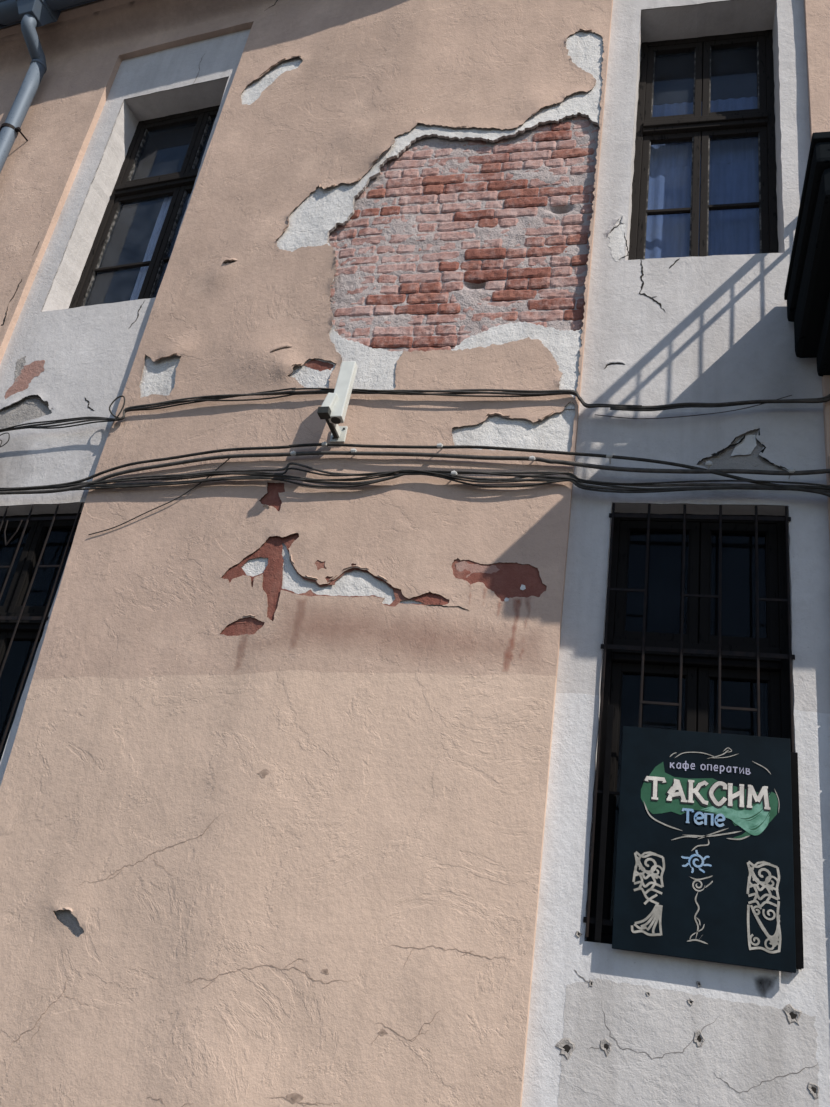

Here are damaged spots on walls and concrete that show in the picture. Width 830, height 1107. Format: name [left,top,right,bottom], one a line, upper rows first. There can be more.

peeling [241,55,303,105]
peeling [276,29,604,452]
crack [610,216,665,311]
flaking render [0,356,53,429]
peeling [139,353,181,398]
peeling [220,533,469,636]
peeling [452,558,547,602]
crack [84,811,227,883]
crack [179,958,351,988]
crack [390,945,511,966]
crack [589,1009,717,1059]
crack [714,1062,819,1093]